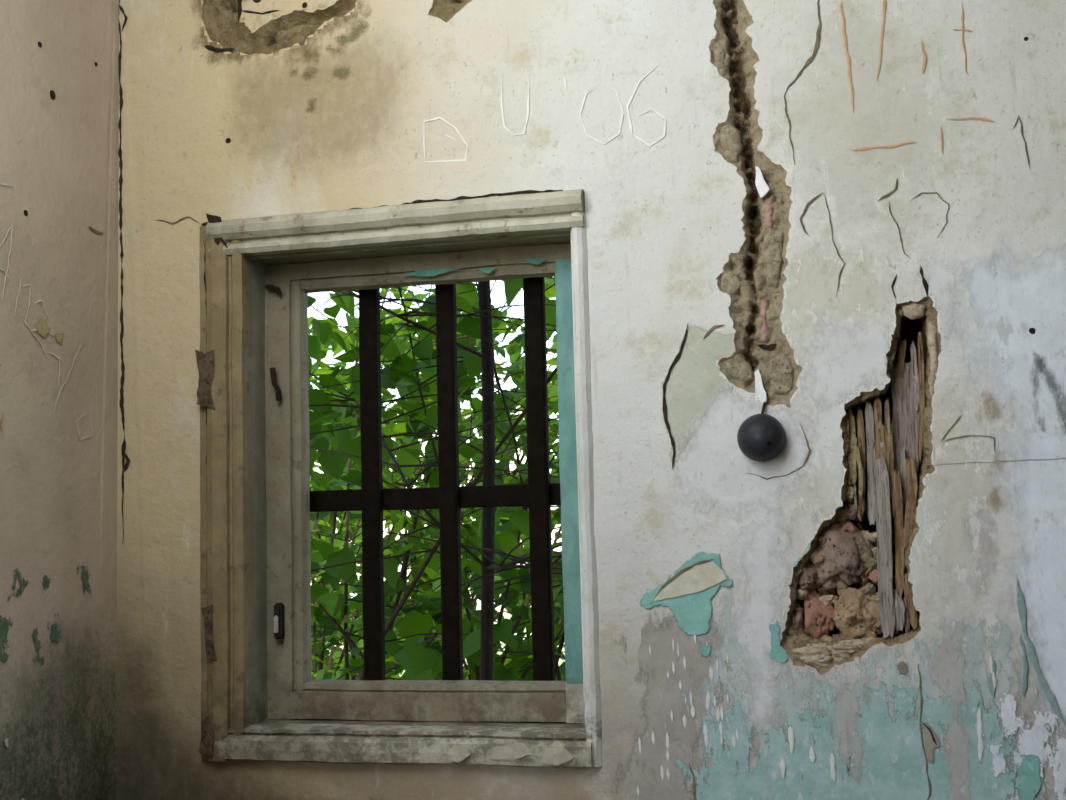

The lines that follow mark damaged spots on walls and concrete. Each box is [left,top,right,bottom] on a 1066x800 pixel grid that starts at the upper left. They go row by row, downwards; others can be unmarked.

flaking render [197,0,361,60]
flaking render [428,0,472,23]
crack [118,0,130,537]
crack [709,0,811,480]
crack [878,178,949,257]
peeling [616,266,1066,800]
peeling [7,568,28,601]
peeling [76,565,91,593]
peeling [0,615,13,662]
peeling [32,616,61,665]